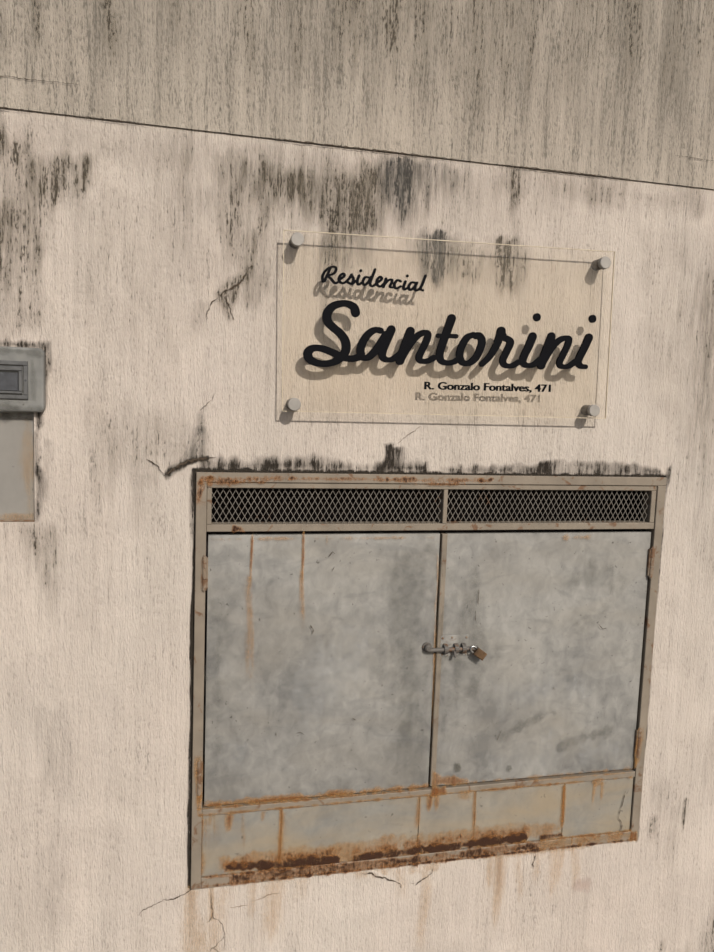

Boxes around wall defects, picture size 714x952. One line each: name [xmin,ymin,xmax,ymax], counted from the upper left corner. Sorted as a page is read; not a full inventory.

leakage [103,0,117,55]
leakage [382,0,401,53]
leakage [511,166,520,205]
leakage [0,127,89,327]
leakage [217,209,268,314]
leakage [414,229,476,286]
leakage [495,235,526,291]
crack [206,264,251,321]
leakage [4,341,51,380]
corrosion [197,773,637,887]
crack [362,868,433,885]
crack [141,890,278,952]